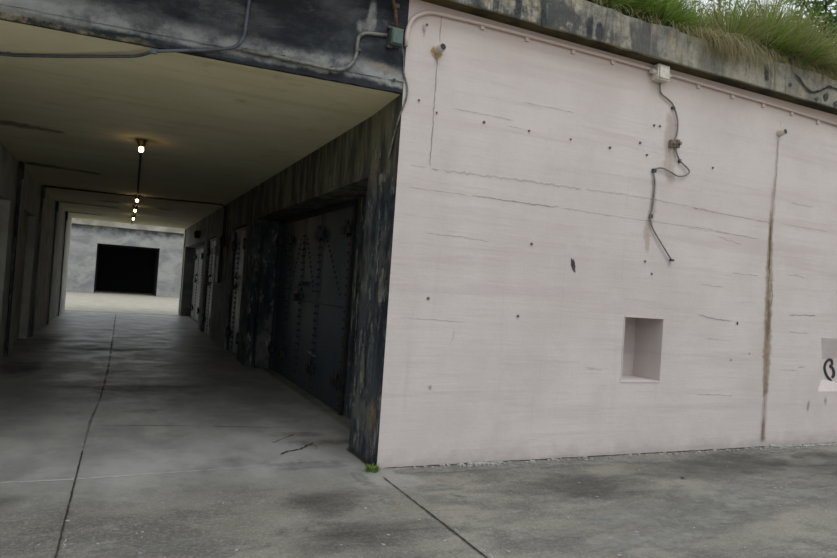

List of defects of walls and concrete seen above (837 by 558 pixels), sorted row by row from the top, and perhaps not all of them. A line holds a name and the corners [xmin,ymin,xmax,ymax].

leakage [358,3,376,31]
leakage [587,17,604,41]
crack [795,73,837,94]
corrosion [764,215,773,393]